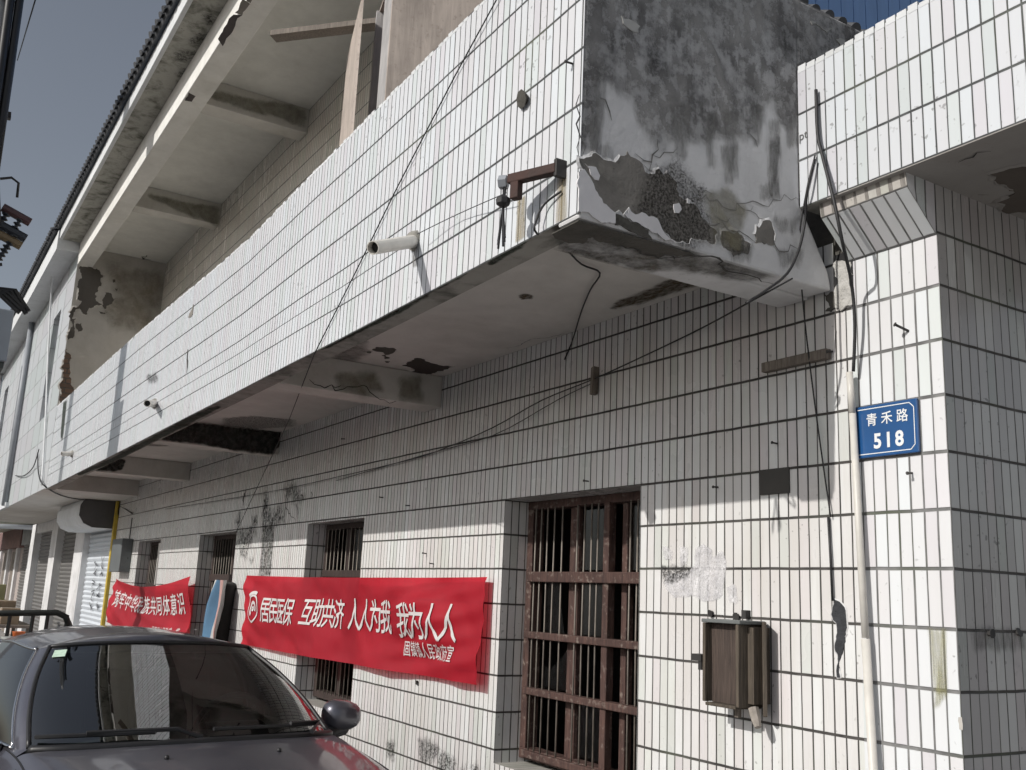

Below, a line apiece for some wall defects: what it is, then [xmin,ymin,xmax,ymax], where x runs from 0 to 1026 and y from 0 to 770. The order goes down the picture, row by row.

spalling [218,0,252,46]
damp [581,0,861,146]
crack [635,140,676,171]
spalling [552,150,777,259]
crack [682,189,798,253]
peeling [984,163,1026,214]
crack [612,244,773,284]
peeling [58,265,117,404]
peeling [367,347,455,375]
damp [260,494,284,576]
spalling [831,598,849,679]
damp [418,740,452,770]